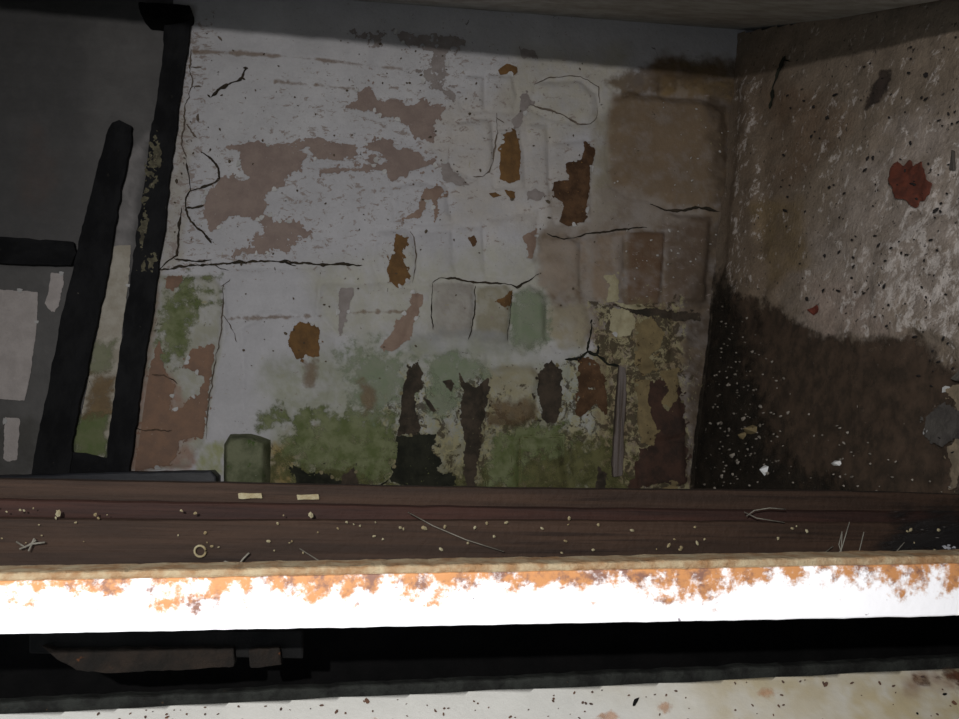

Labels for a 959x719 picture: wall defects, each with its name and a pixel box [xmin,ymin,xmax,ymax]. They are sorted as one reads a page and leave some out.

crack [159,51,361,435]
peeling [202,28,539,263]
peeling [380,233,423,352]
crack [410,232,538,340]
spalling [527,141,595,227]
crack [547,204,720,240]
leakage [292,407,317,454]
peeling [384,360,491,486]
peeling [532,360,564,424]
peeling [627,376,692,488]
leakage [690,270,959,494]
leakage [877,507,959,551]